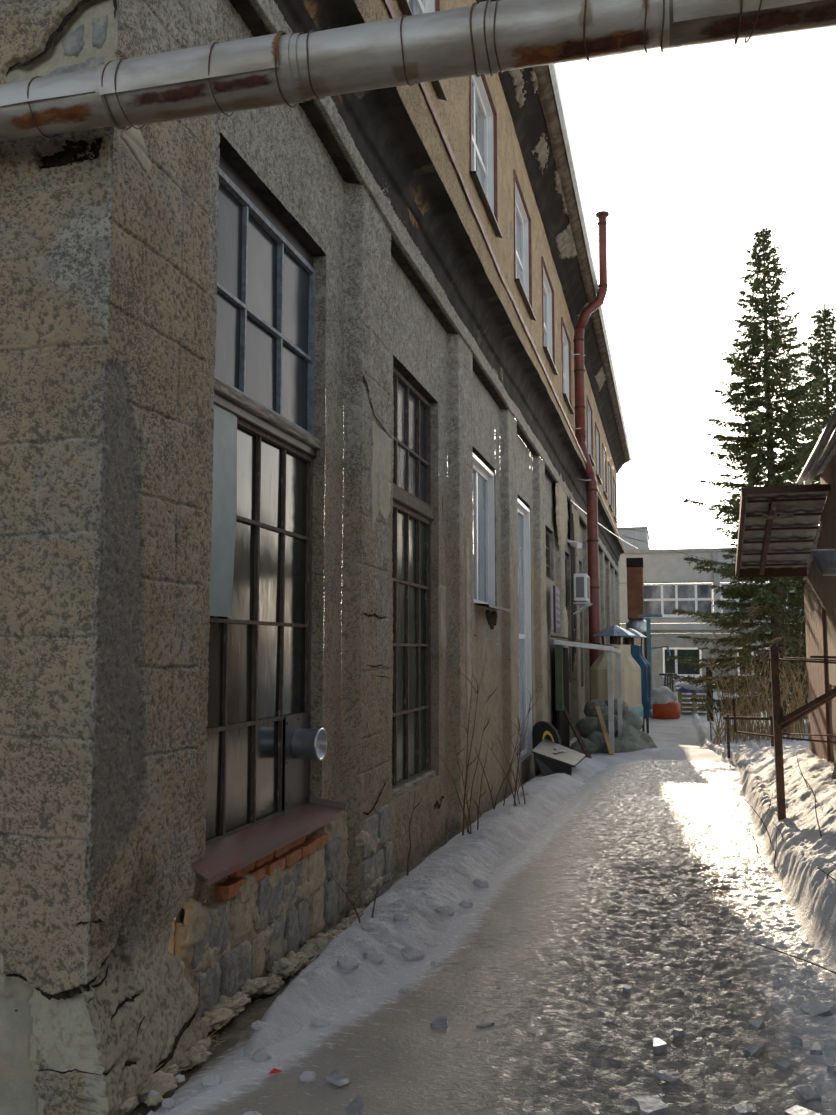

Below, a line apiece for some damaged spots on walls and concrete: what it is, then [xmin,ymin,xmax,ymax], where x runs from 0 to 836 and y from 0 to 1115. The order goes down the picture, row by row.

rust [702,4,836,39]
flaking render [47,15,108,76]
rust [513,30,649,68]
rust [135,75,272,105]
rust [12,105,90,129]
flaking render [0,980,41,1115]